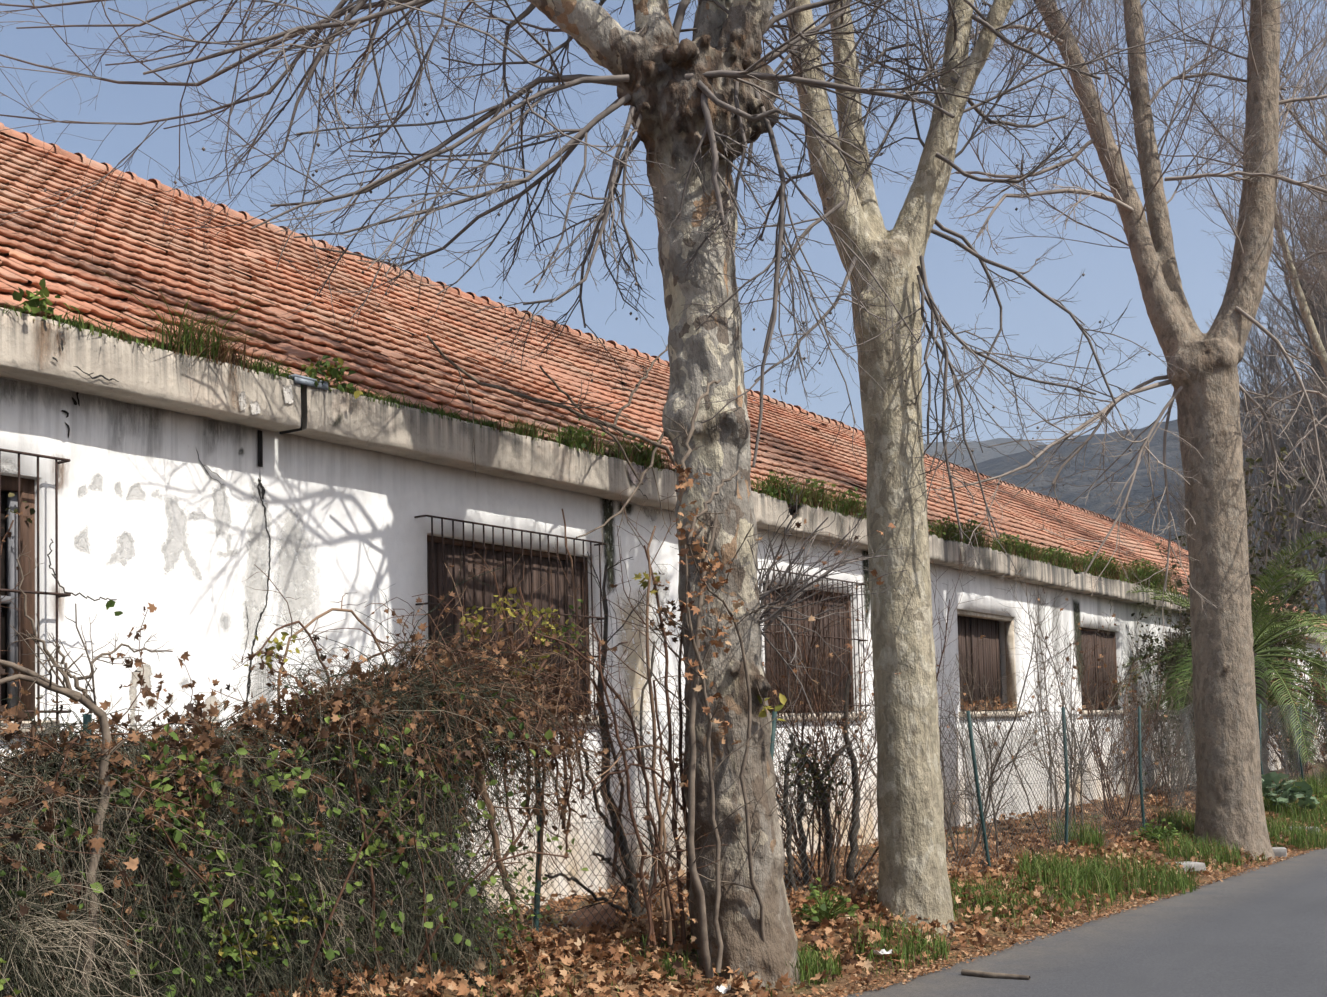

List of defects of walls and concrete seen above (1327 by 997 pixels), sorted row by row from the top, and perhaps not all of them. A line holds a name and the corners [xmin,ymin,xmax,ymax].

peeling [75,531,90,552]
peeling [78,449,273,704]
crack [244,476,271,700]
leakage [279,513,315,625]